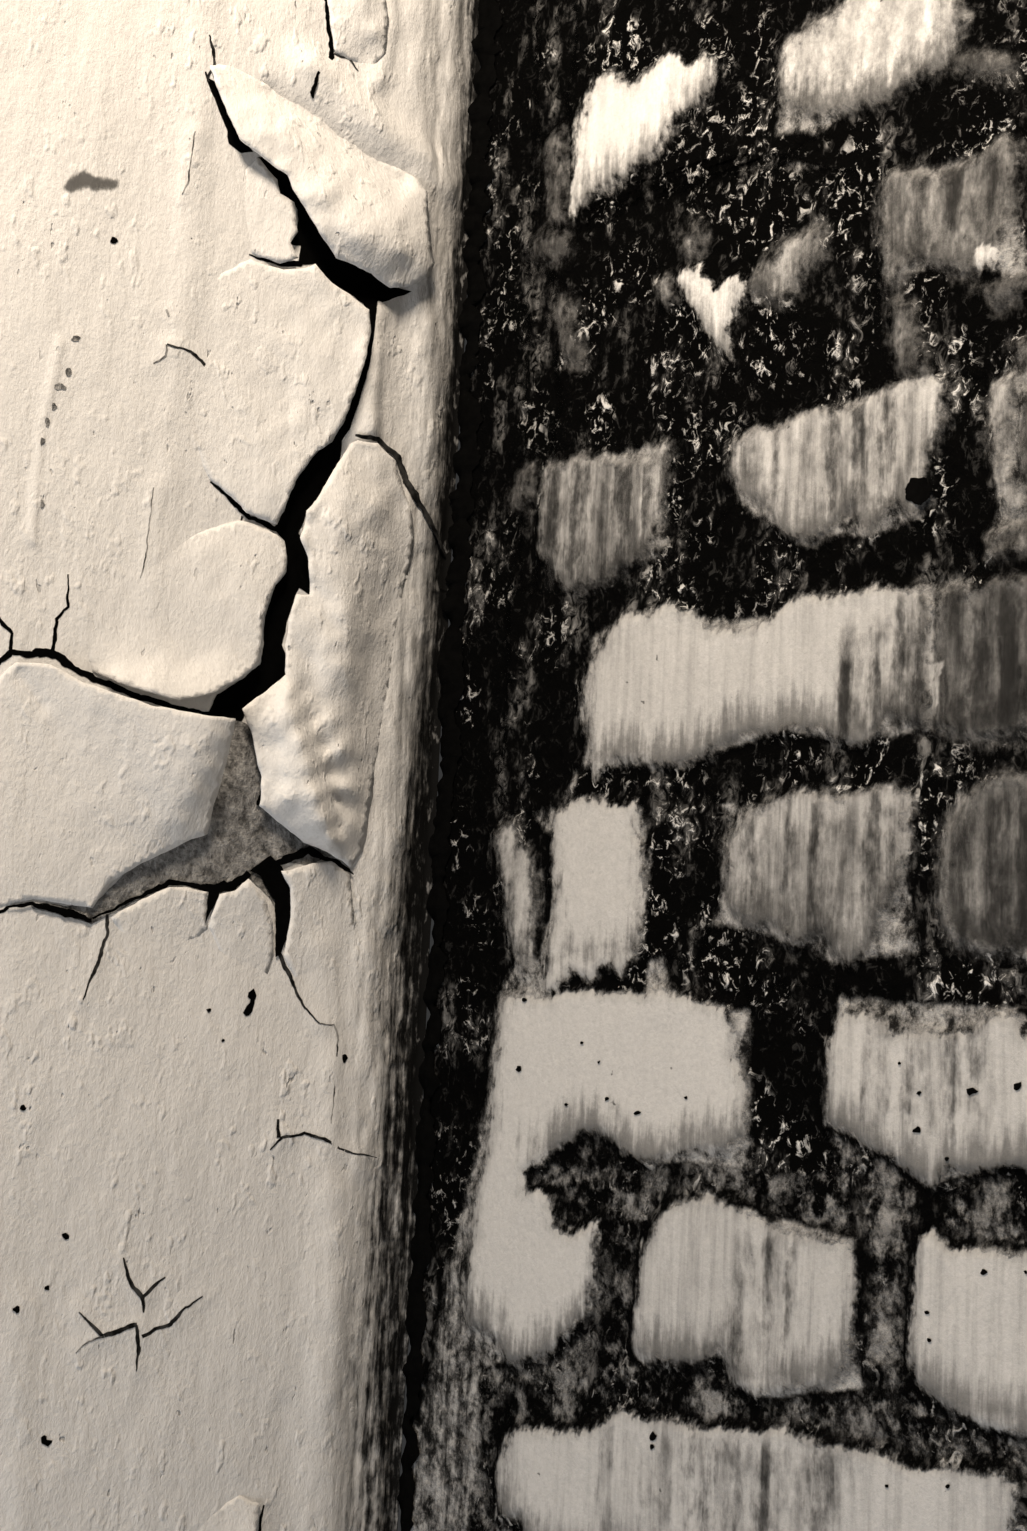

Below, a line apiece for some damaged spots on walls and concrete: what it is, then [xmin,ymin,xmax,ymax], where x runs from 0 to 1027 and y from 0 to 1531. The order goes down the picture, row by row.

crack [182,131,196,194]
crack [153,309,206,367]
peeling [0,0,446,977]
crack [140,487,154,578]
crack [83,914,109,1000]
peeling [243,989,256,1016]
crack [76,1258,203,1371]